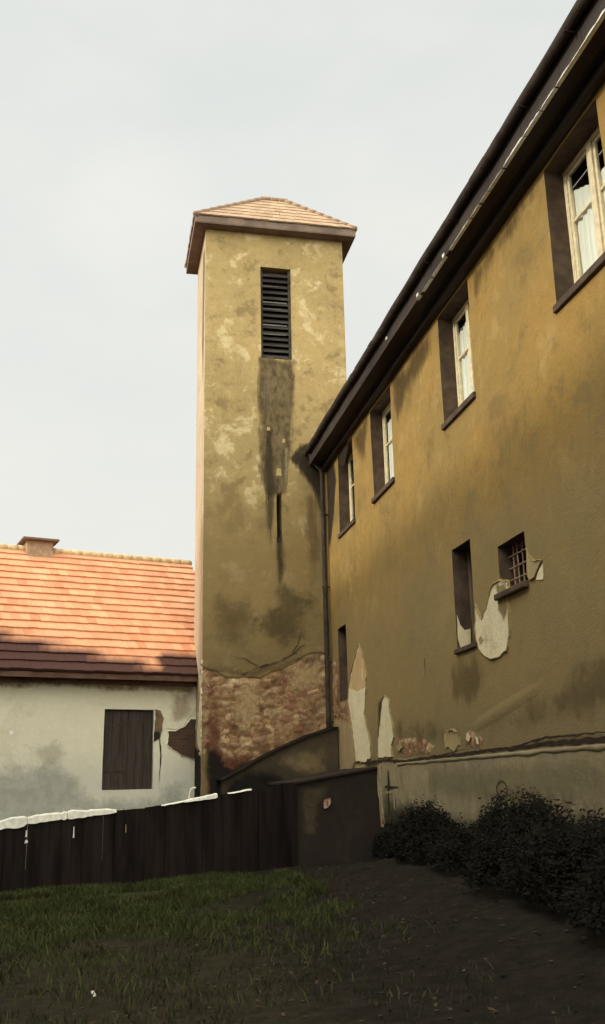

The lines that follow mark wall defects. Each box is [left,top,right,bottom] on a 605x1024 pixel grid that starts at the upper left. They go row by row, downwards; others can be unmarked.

damp [266,430,305,579]
peeling [526,548,543,581]
crack [237,629,305,675]
peeling [457,579,511,661]
spalling [153,644,483,827]